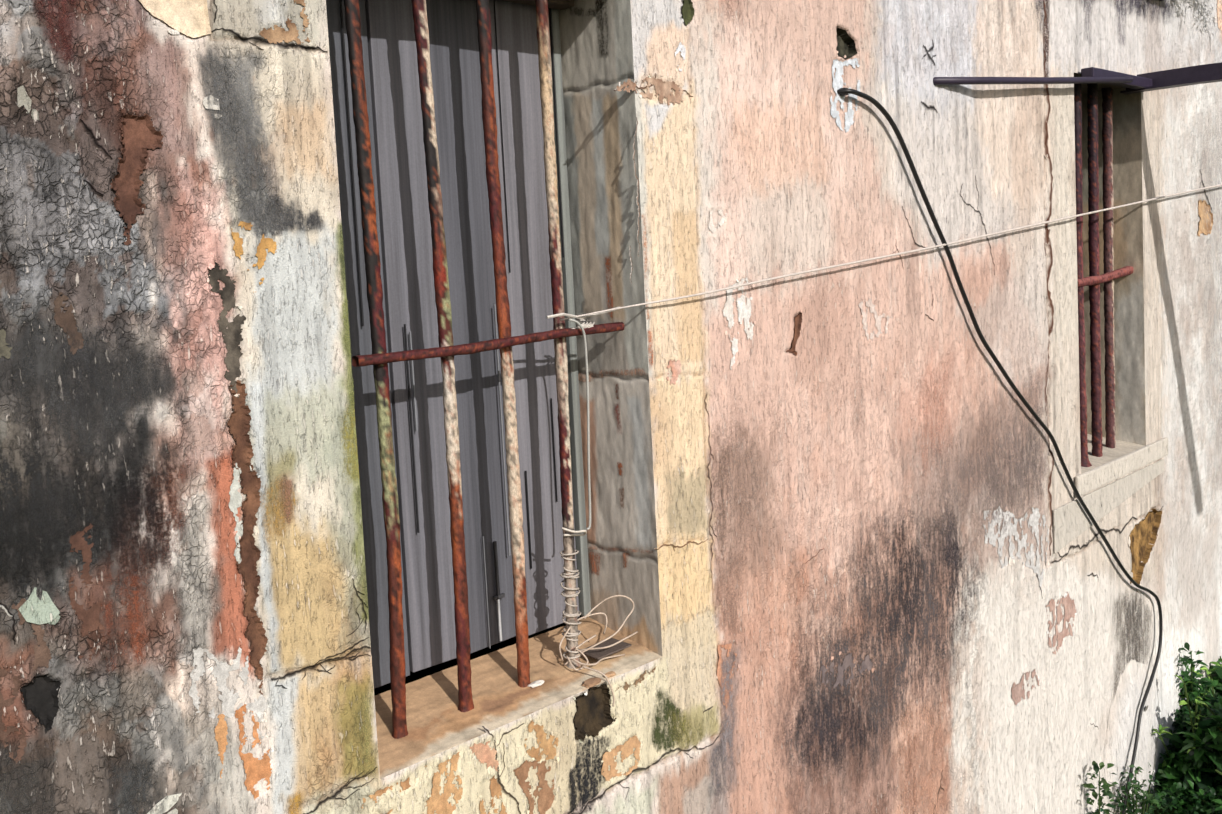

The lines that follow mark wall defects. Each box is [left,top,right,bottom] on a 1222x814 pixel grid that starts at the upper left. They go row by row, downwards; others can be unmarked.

crack [203,0,328,53]
crack [79,119,112,159]
water stain [205,56,321,236]
rust [605,257,613,317]
crack [1036,0,1163,599]
rust [578,332,653,428]
water stain [0,339,168,584]
spalling [186,260,274,799]
rust [589,546,649,574]
water stain [784,371,1043,771]
spalling [1128,508,1163,585]
spalling [573,667,656,742]